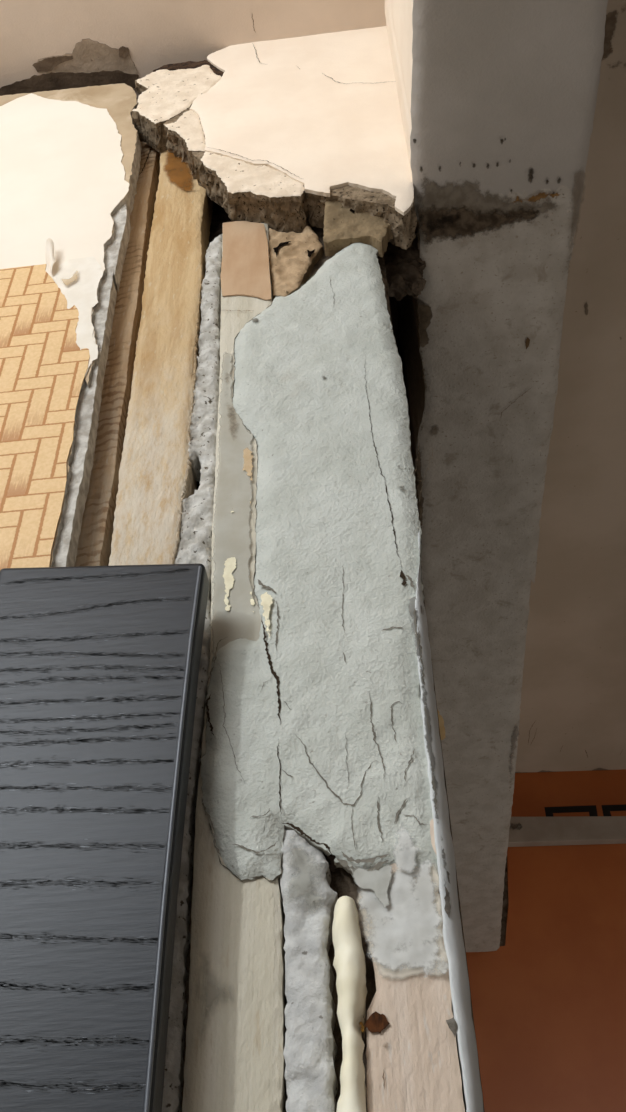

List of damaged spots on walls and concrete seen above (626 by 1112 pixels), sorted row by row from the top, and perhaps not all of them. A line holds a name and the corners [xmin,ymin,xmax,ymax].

flaking render [33,39,305,203]
water stain [417,166,561,244]
water stain [570,172,585,248]
crack [365,347,414,589]
crack [202,566,428,872]